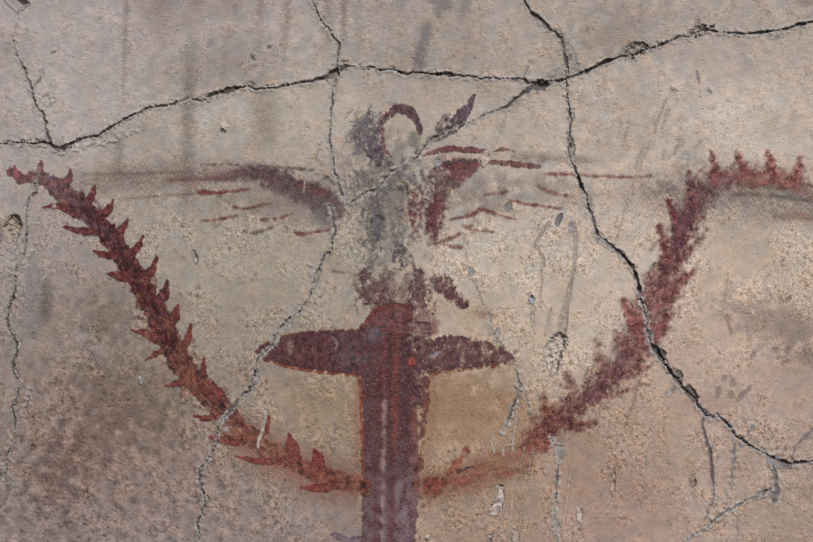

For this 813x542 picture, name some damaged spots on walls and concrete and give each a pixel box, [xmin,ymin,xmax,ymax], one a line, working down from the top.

spalling [5,0,31,12]
crack [0,52,246,155]
crack [3,169,43,490]
crack [196,204,338,542]
crack [247,0,813,542]
spalling [543,332,569,376]